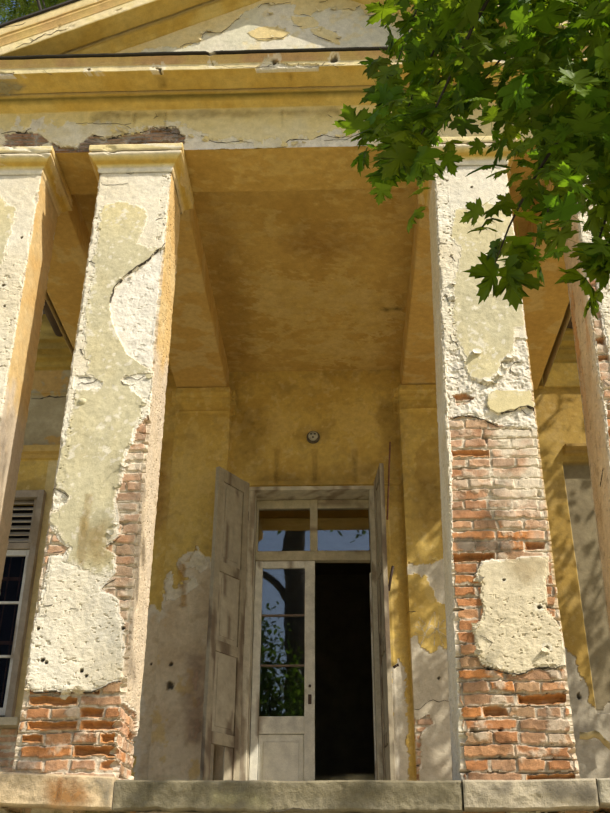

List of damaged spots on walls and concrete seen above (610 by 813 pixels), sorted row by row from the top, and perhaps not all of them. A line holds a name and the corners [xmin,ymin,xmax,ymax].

peeling [142,3,411,73]
peeling [0,115,382,153]
crack [110,218,165,303]
peeling [0,172,224,781]
spalling [406,164,610,780]
peeling [392,636,452,781]